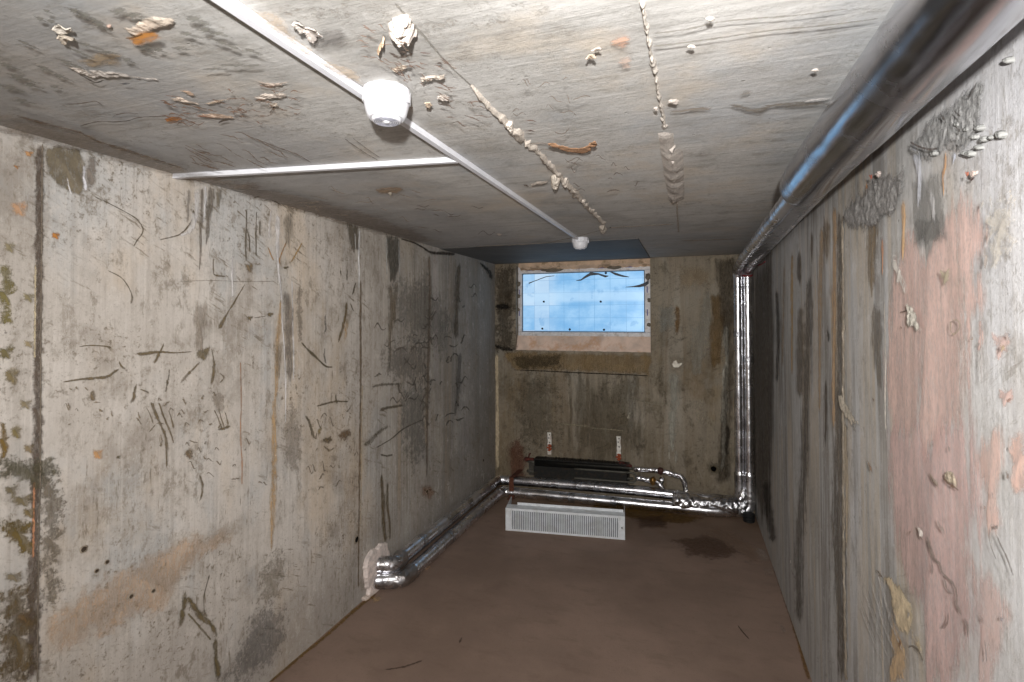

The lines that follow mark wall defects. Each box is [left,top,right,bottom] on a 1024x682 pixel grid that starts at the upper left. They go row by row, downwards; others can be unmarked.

spalling [51,24,76,45]
spalling [125,16,174,45]
spalling [69,54,157,84]
peeling [250,81,287,113]
peeling [420,52,445,82]
crack [510,77,637,209]
water stain [0,266,34,324]
water stain [495,267,650,373]
water stain [0,341,32,384]
rust [270,302,281,547]
peeling [877,204,1010,682]
water stain [0,423,67,682]